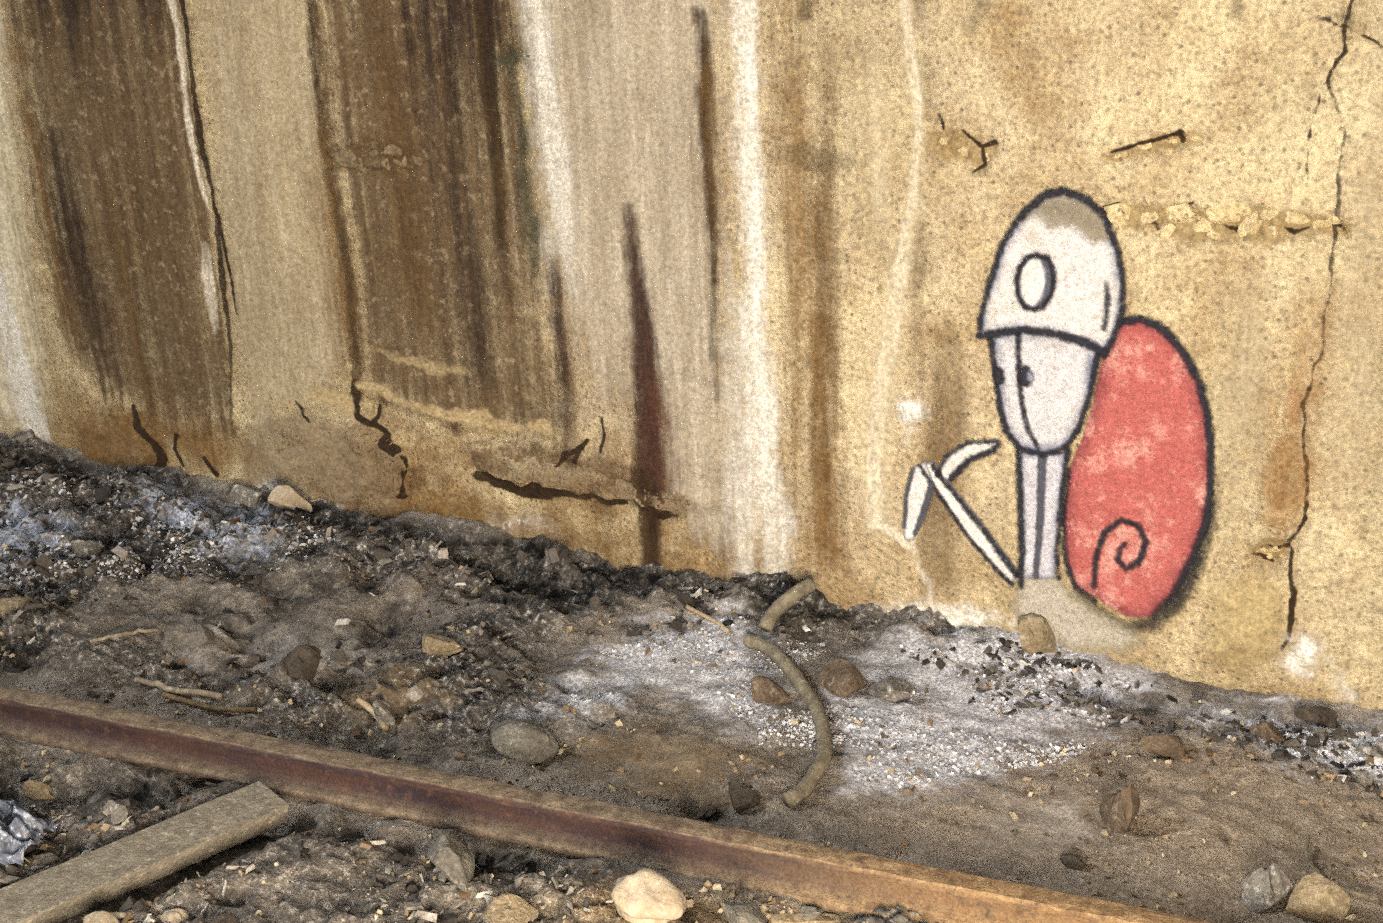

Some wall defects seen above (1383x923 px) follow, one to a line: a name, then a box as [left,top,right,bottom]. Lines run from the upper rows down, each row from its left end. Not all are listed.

leakage [9,0,236,438]
leakage [307,0,572,434]
corrosion [693,10,717,287]
spalling [927,132,998,174]
spalling [1102,135,1203,160]
spalling [1101,201,1351,245]
leakage [0,271,49,440]
crack [132,404,219,477]
crack [349,379,408,499]
peeling [244,381,696,520]
corrosion [624,209,667,565]
crack [1268,0,1380,651]